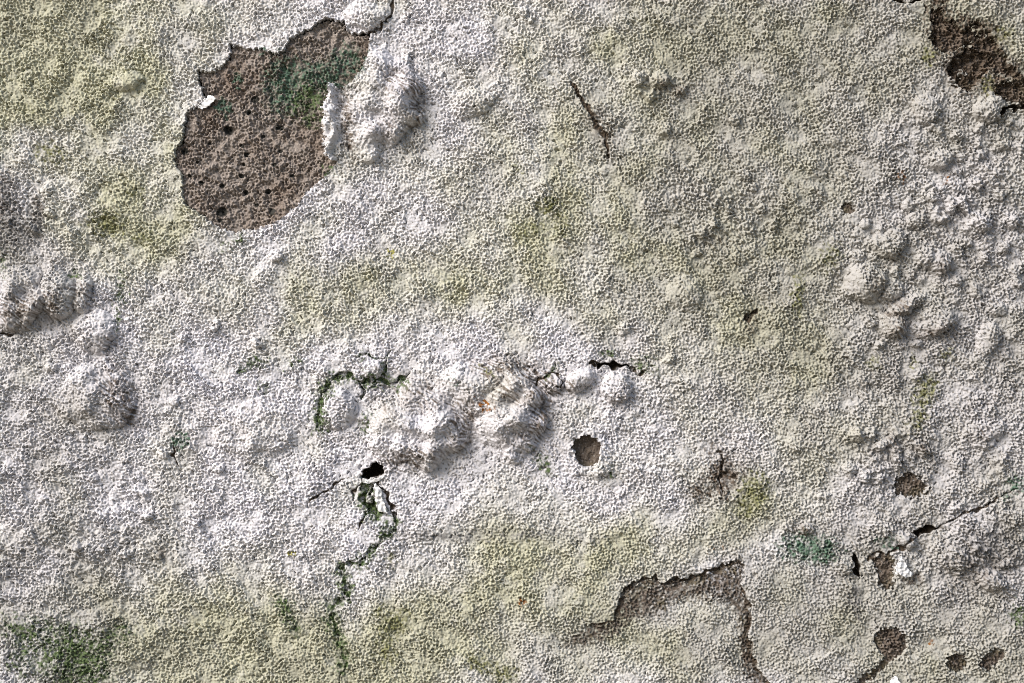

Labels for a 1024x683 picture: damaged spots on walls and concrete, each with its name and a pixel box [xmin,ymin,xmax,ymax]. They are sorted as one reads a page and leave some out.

spalling [923,0,1024,109]
spalling [175,20,370,233]
crack [571,82,610,159]
crack [309,350,410,435]
crack [588,360,645,376]
spalling [571,435,601,466]
crack [309,462,402,683]
crack [852,491,1011,577]
damp [1,612,37,645]
damp [57,625,131,683]
peeling [573,560,766,683]
spalling [857,627,907,683]